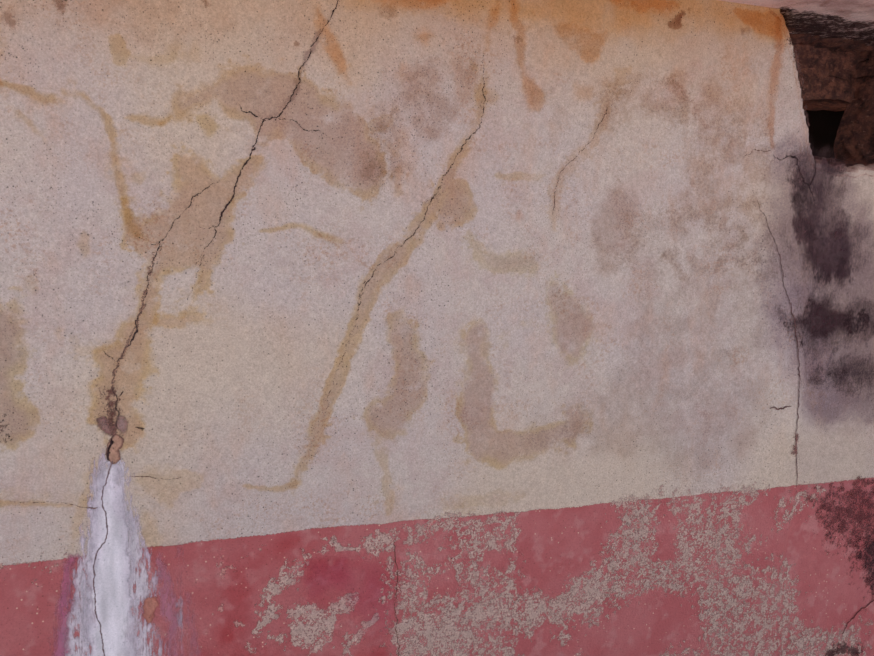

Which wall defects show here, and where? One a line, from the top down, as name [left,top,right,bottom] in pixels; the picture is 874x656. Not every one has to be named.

crack [341,55,486,362]
crack [745,149,816,211]
damp [793,158,851,283]
spalling [804,110,845,158]
crack [20,1,338,656]
crack [757,200,801,479]
damp [788,299,874,345]
damp [828,361,873,384]
damp [55,453,182,656]
peeling [233,480,873,656]
damp [807,477,874,598]